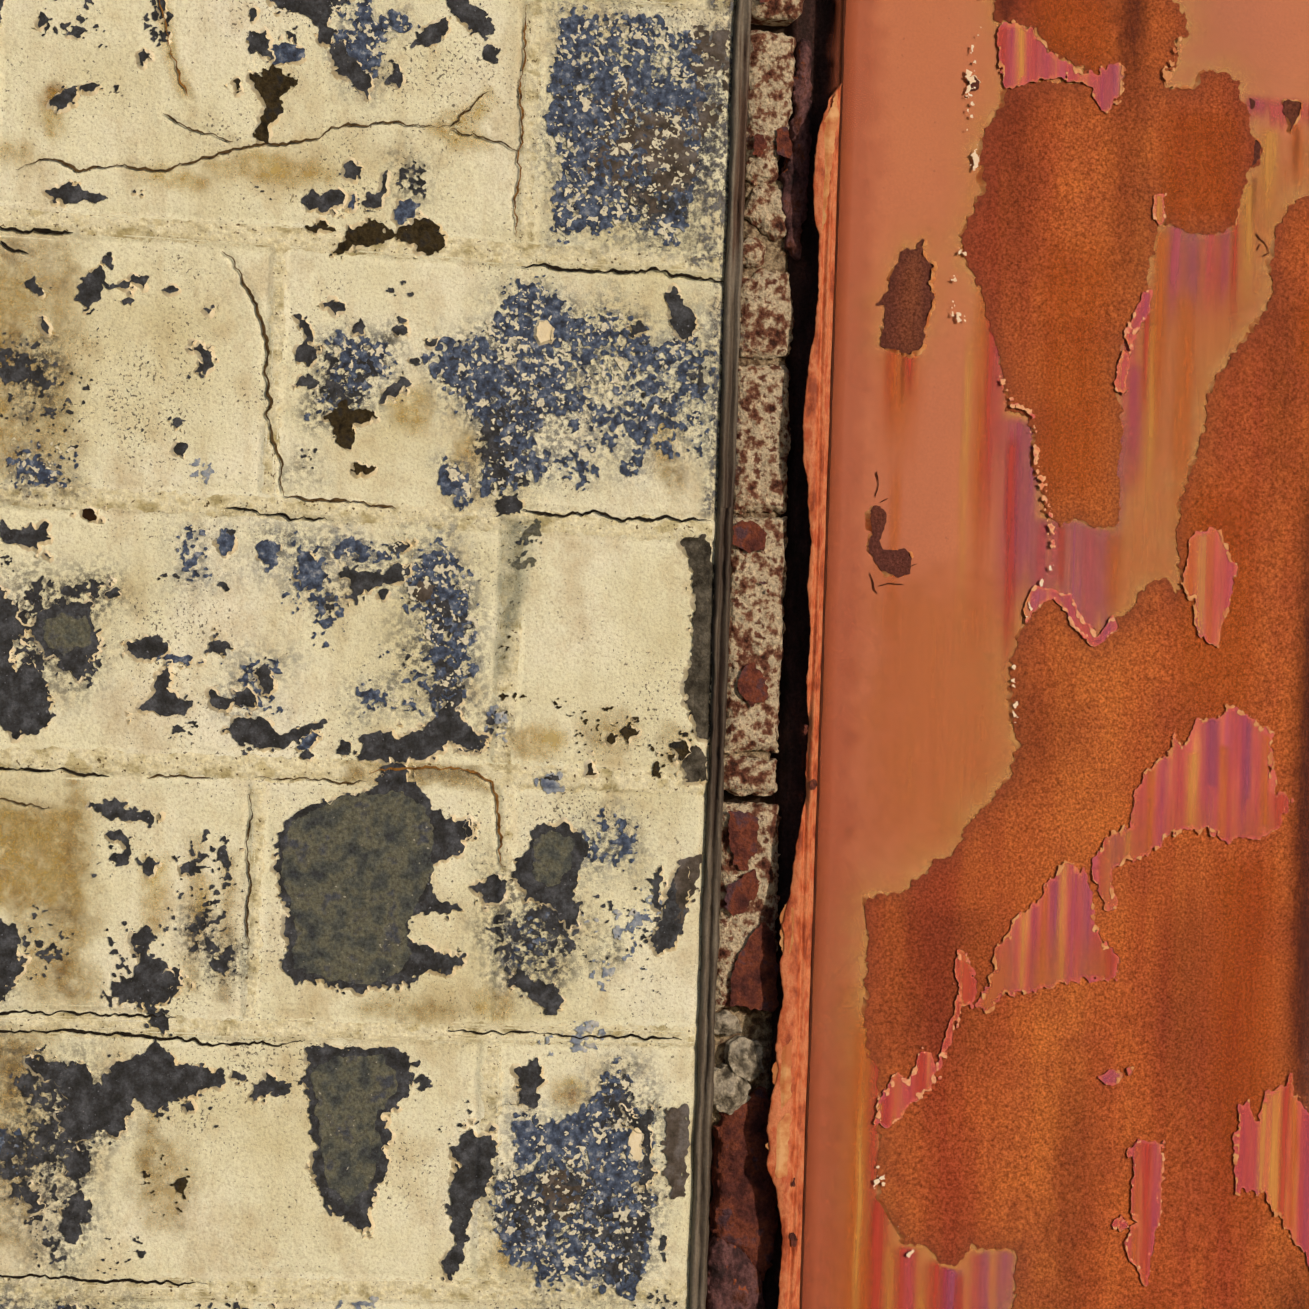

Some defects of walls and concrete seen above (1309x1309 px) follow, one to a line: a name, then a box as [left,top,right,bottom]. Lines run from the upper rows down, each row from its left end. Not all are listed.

crack [15,0,527,235]
peeling [225,0,501,148]
peeling [0,518,328,762]
peeling [0,797,442,1276]
crack [222,251,397,521]
peeling [255,531,715,1309]
peeling [291,275,721,570]
crack [521,263,723,282]
corrosion [1006,421,1034,623]
peeling [876,0,1263,549]
peeling [861,196,1309,1309]
corrosion [1298,622,1309,1057]